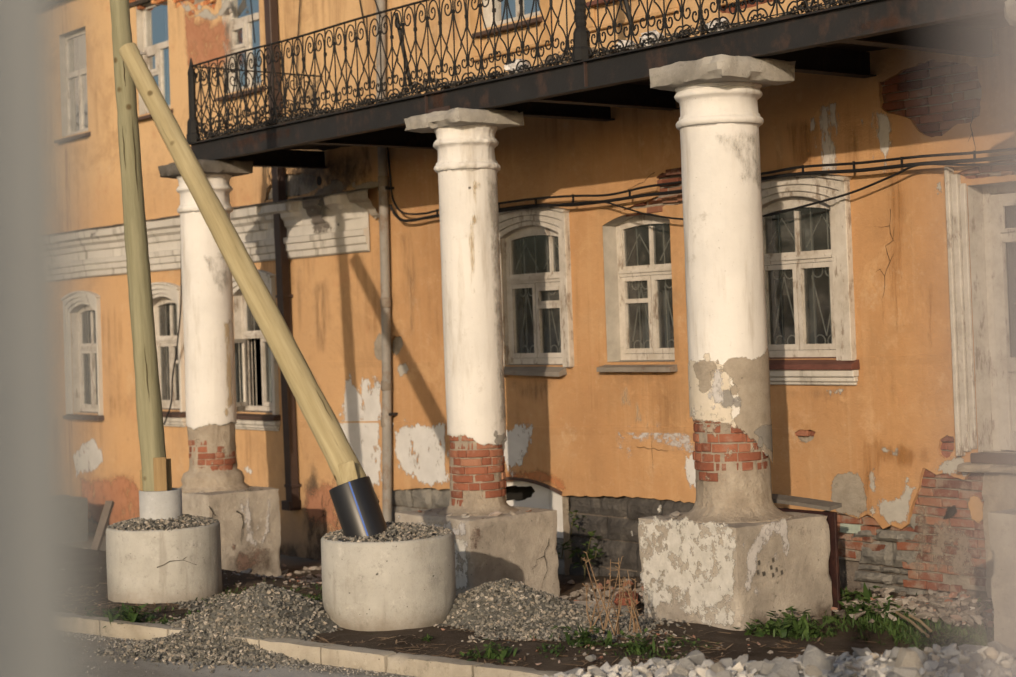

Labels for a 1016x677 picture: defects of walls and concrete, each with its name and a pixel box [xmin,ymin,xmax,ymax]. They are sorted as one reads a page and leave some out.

flaking render [129,0,232,20]
flaking render [880,60,982,137]
crack [874,209,895,295]
flaking render [188,439,252,475]
peeling [340,374,382,485]
peeling [392,423,533,506]
peeling [619,349,773,487]
flaking render [830,436,987,595]
peeling [636,505,736,626]